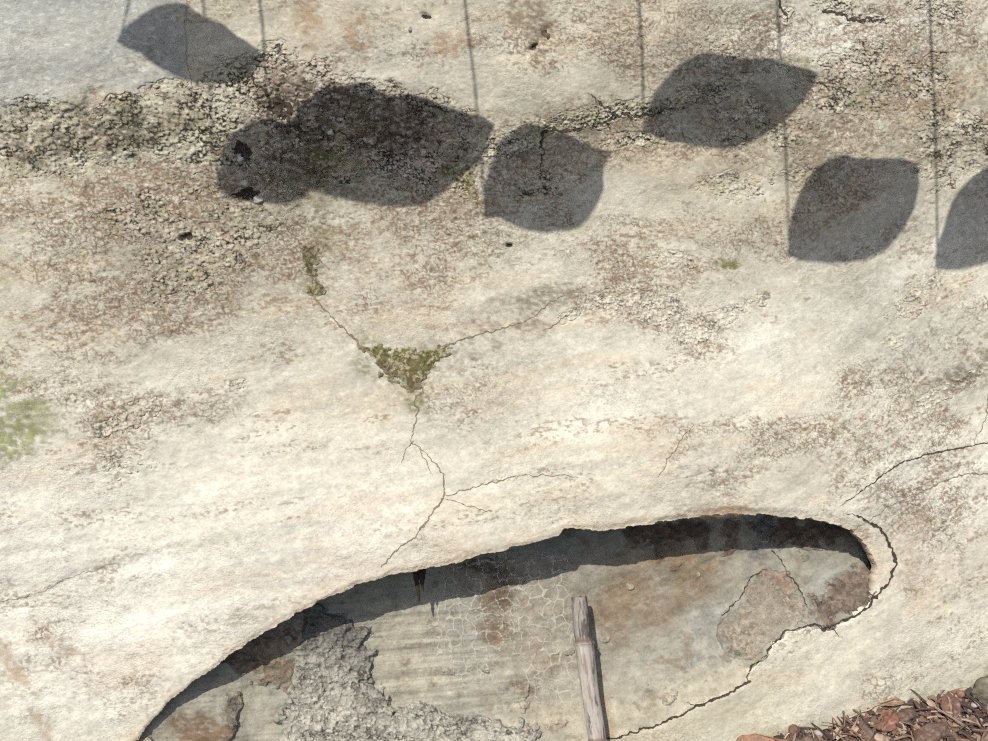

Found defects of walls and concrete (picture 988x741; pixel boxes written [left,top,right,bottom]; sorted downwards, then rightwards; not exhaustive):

leakage [259,77,434,177]
crack [442,295,577,347]
crack [381,386,570,566]
crack [432,547,580,704]
spalling [137,513,877,741]
crack [606,398,988,739]